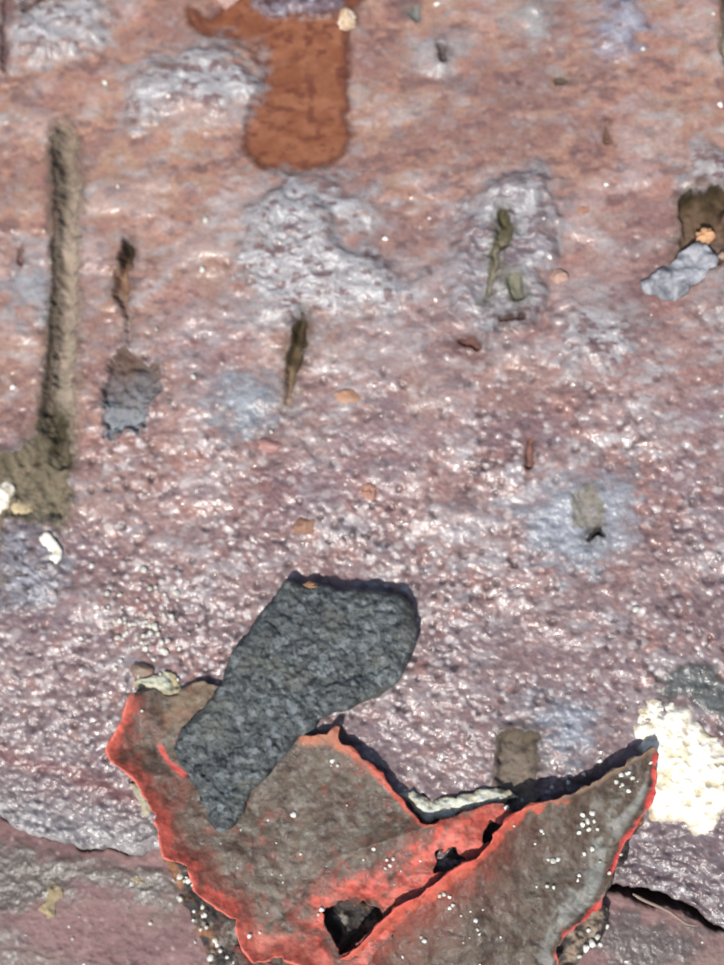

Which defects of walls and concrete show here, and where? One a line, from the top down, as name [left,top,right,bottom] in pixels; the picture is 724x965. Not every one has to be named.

spalling [640,184,724,301]
leakage [16,275,49,323]
leakage [0,518,73,610]
leakage [661,664,724,722]